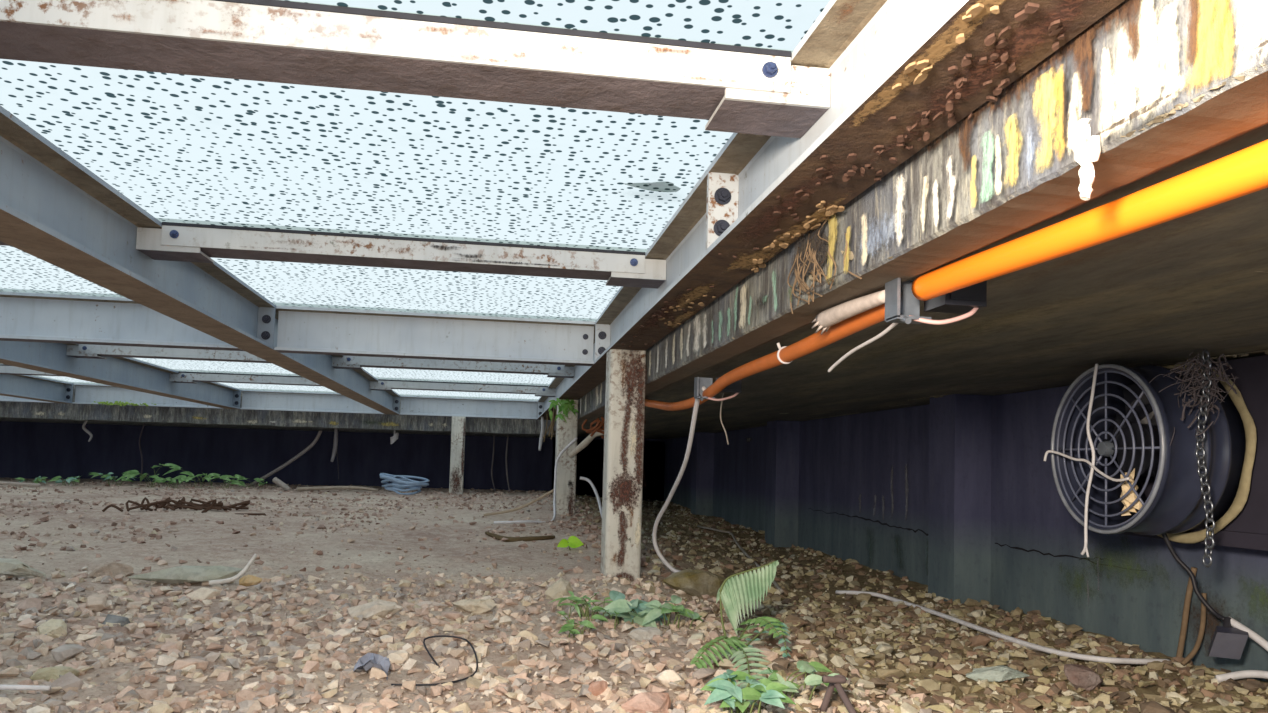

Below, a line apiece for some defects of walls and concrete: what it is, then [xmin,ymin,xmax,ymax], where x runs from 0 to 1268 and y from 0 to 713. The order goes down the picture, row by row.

rust [434,245,557,266]
rust [658,284,716,328]
rust [609,350,646,581]
crack [809,508,928,536]
crack [995,543,1147,571]